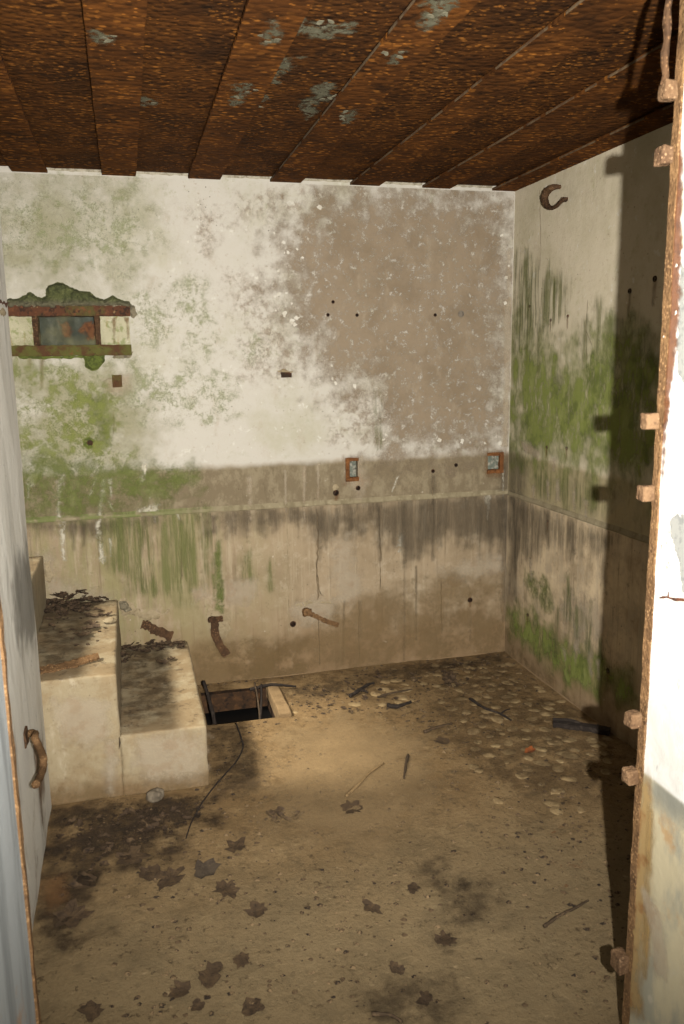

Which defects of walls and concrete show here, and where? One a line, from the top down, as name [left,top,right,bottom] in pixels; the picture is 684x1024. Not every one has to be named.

spalling [7,282,137,319]
spalling [83,355,105,371]
damp [88,471,113,562]
damp [378,473,504,553]